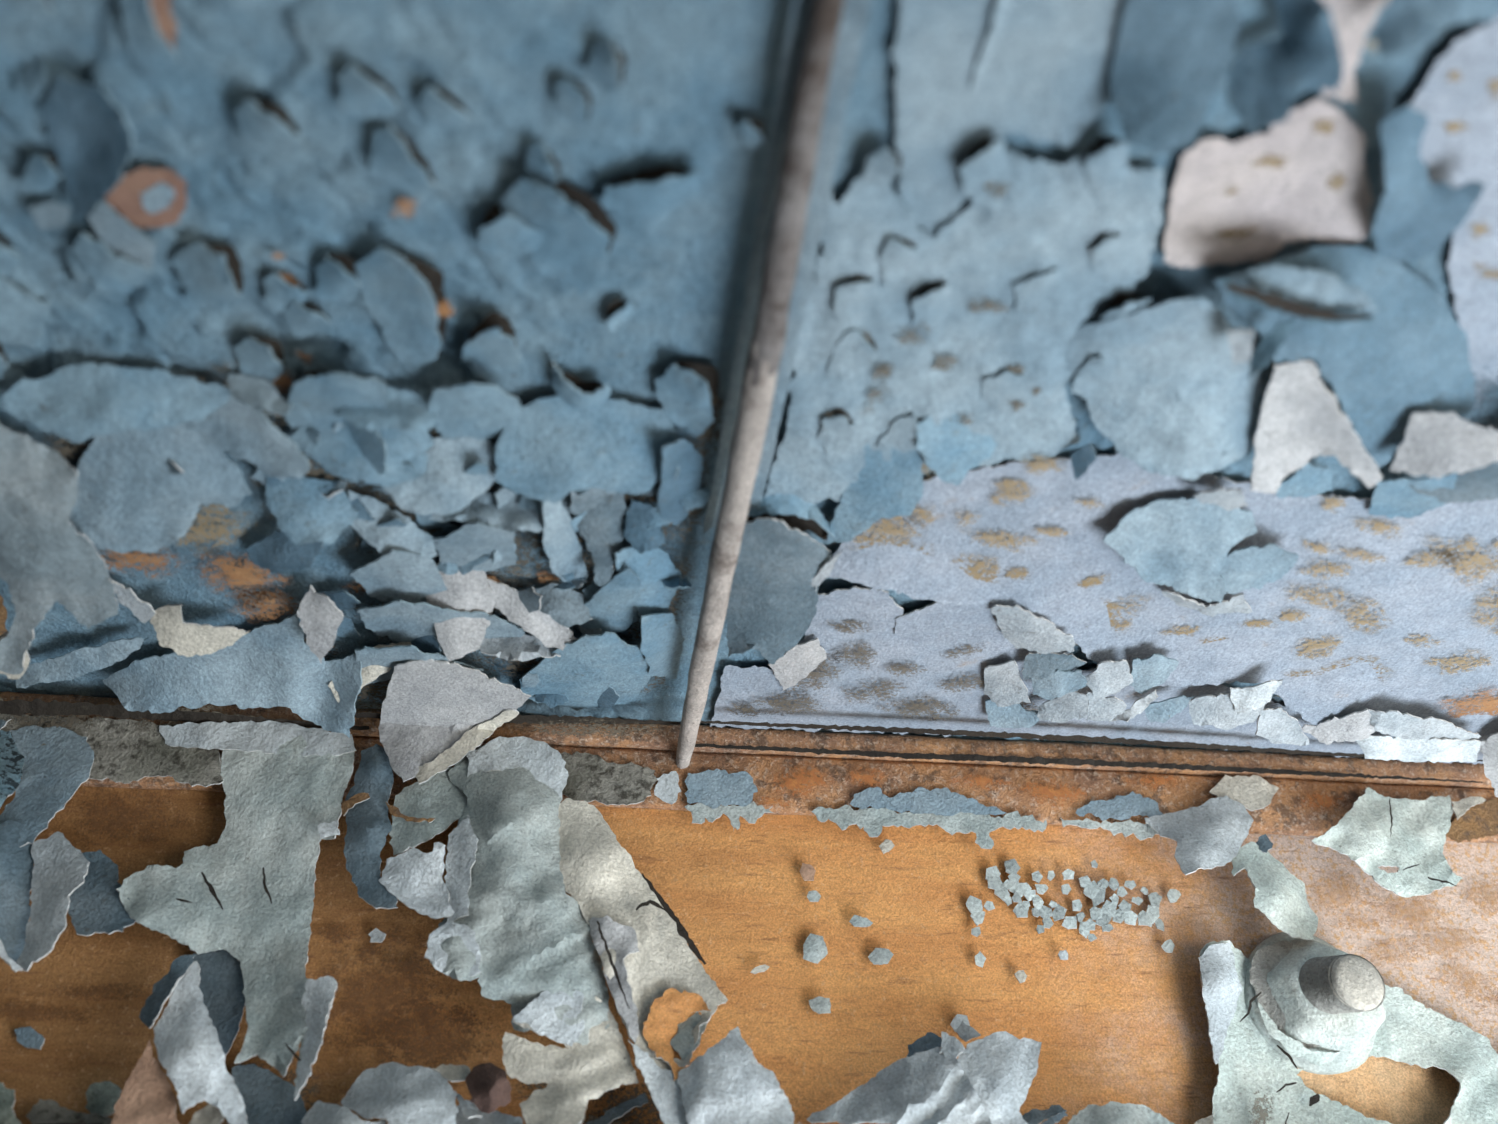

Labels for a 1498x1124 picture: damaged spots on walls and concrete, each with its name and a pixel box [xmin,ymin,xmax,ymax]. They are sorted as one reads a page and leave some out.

peeling [20,73,243,309]
peeling [477,142,703,296]
peeling [710,0,1498,898]
peeling [0,234,1174,1124]
corrosion [955,511,1068,582]
corrosion [1243,540,1388,678]
corrosion [1404,634,1491,674]
corrosion [1405,537,1498,634]
corrosion [1442,688,1498,718]
peeling [966,775,1318,968]
corrosion [1446,799,1498,843]
peeling [1194,940,1498,1124]